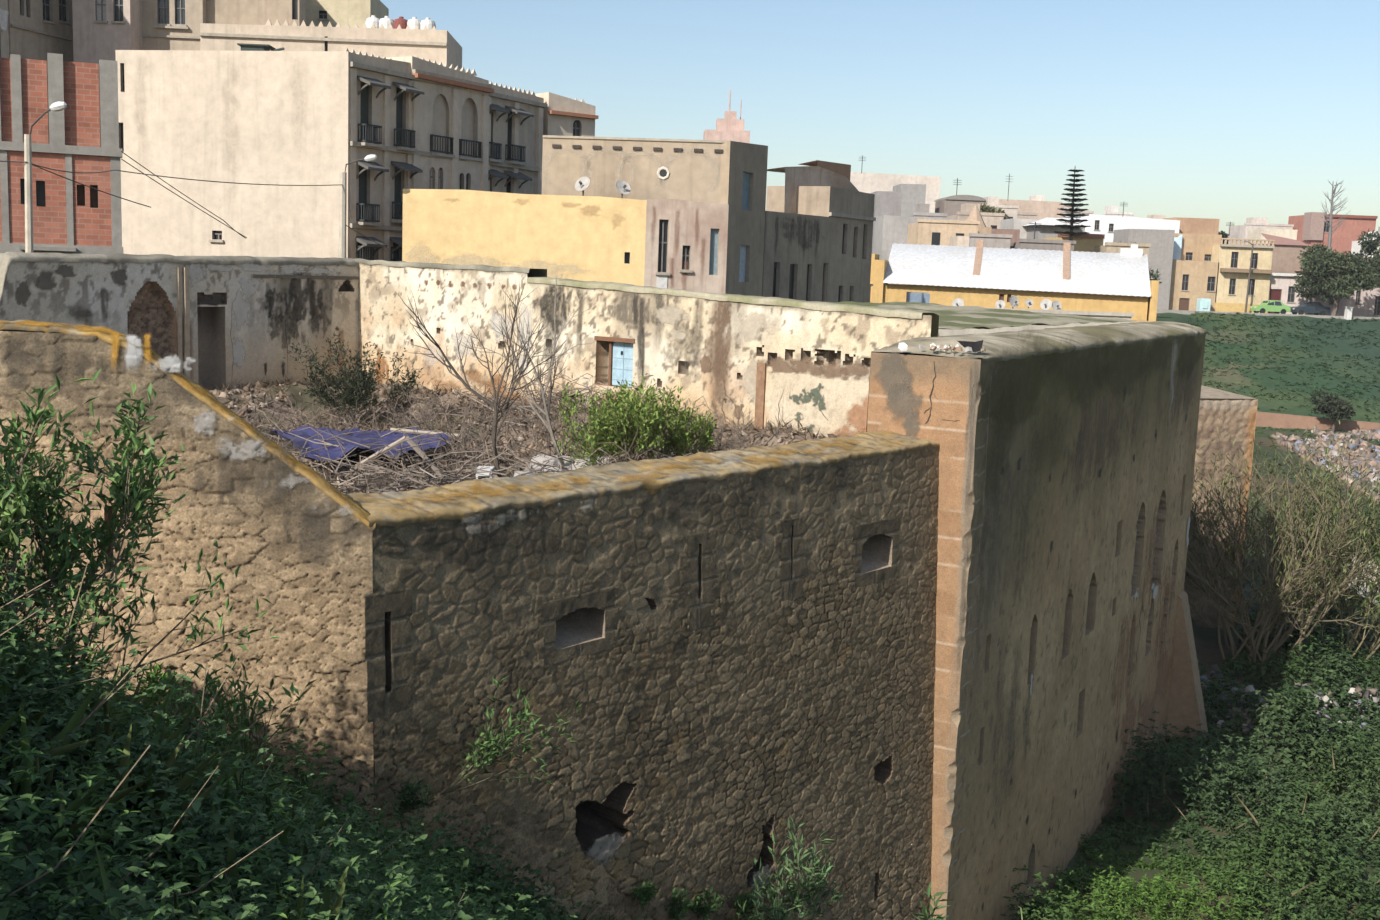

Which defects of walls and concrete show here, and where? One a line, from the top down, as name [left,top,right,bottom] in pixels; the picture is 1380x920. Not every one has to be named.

peeling [15,265,76,306]
peeling [111,269,127,285]
water stain [265,273,331,345]
water stain [602,292,675,382]
water stain [677,301,731,401]
spalling [723,313,871,418]
spalling [834,398,868,437]
water stain [878,352,921,436]
crack [924,364,960,424]
hole [575,781,637,863]
hole [747,814,775,898]